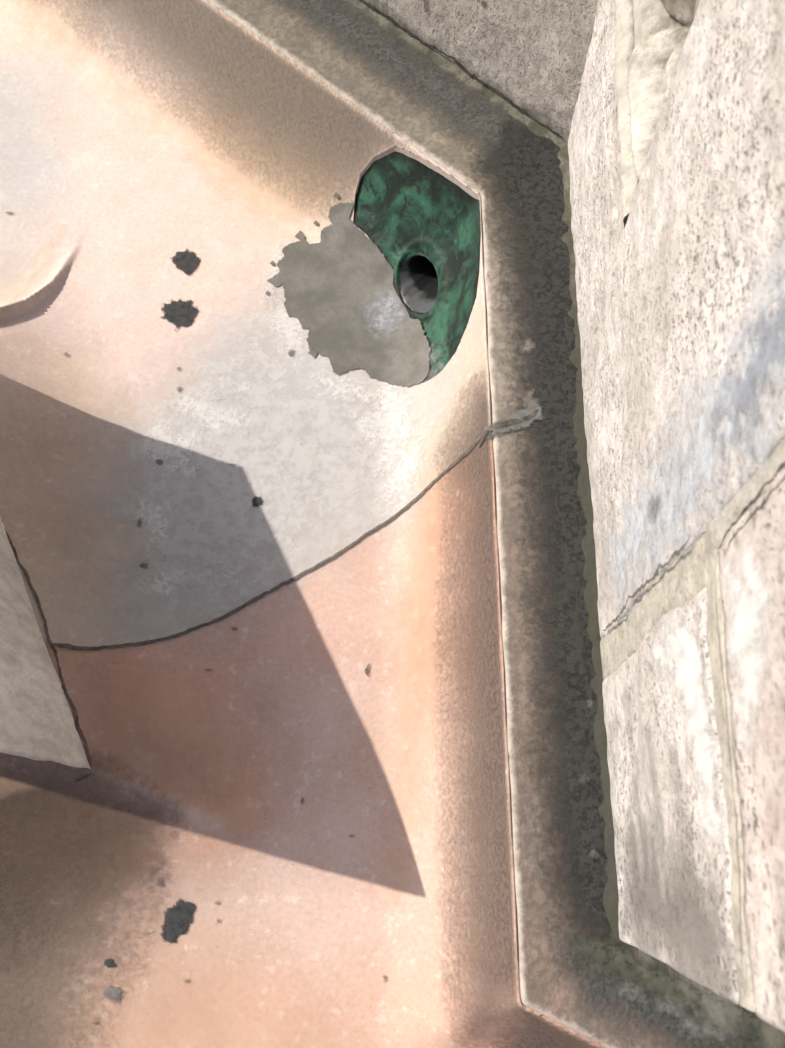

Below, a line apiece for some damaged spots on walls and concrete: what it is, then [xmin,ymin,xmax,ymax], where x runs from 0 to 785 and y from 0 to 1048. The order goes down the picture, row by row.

water stain [77,0,392,198]
water stain [161,299,198,331]
water stain [170,249,199,275]
spalling [266,192,431,387]
water stain [279,0,611,939]
crack [1,407,544,782]
water stain [444,383,595,1048]
water stain [653,623,721,835]
water stain [161,898,195,943]
water stain [623,865,718,983]